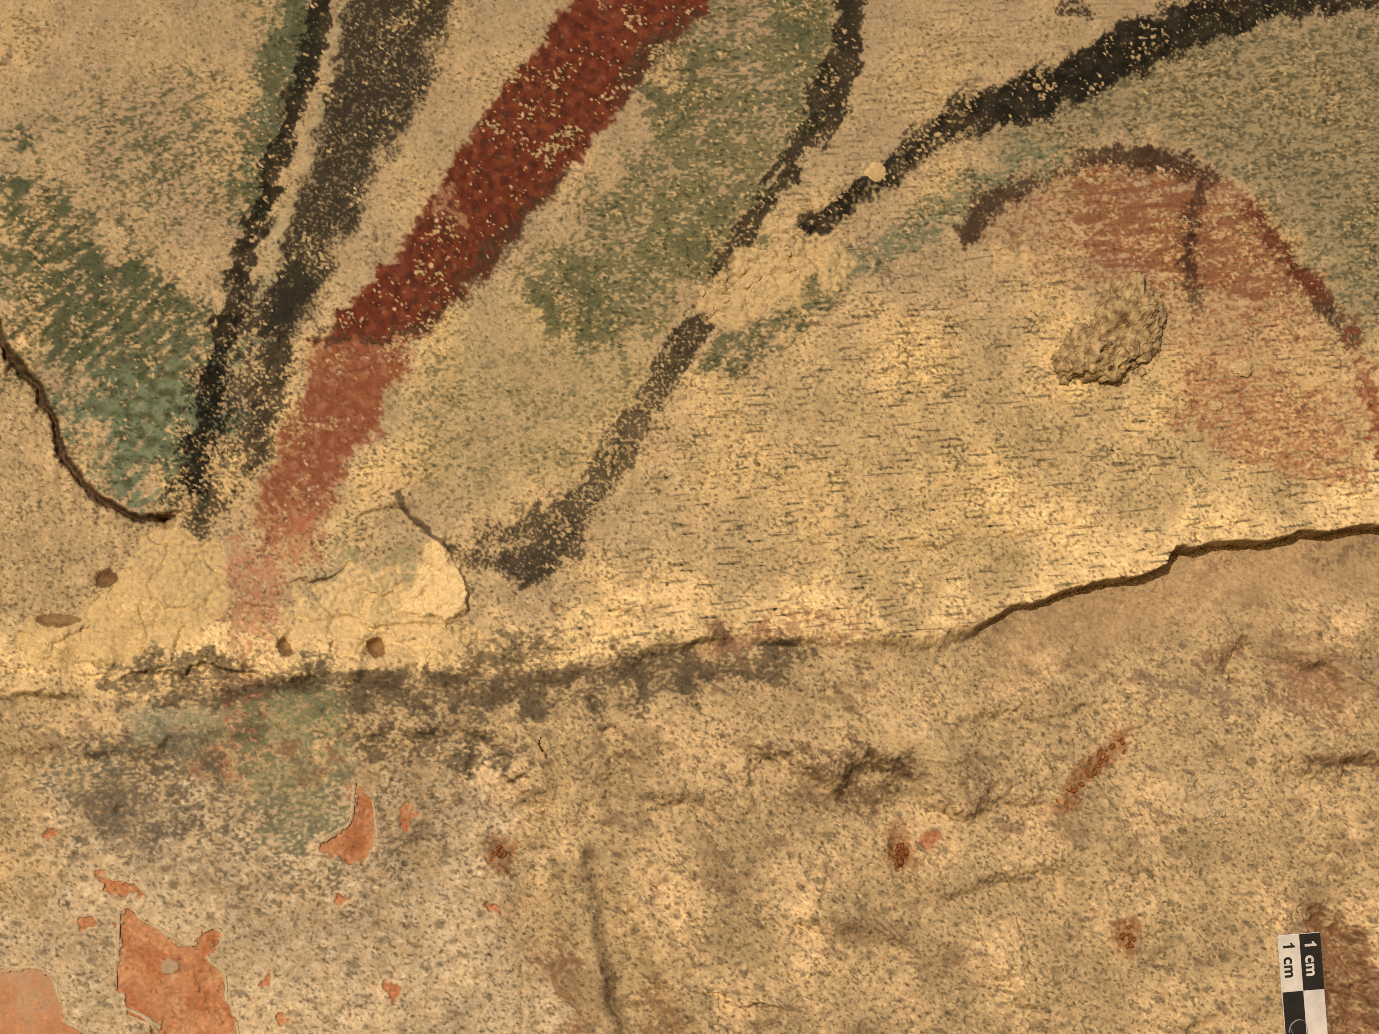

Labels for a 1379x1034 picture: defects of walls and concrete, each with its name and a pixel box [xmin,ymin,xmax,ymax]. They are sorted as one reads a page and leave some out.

crack [0,319,183,527]
crack [847,525,1130,555]
rust [1044,724,1140,823]
peeling [320,783,378,867]
peeling [78,917,97,933]
peeling [94,870,240,1034]
peeling [0,965,88,1034]